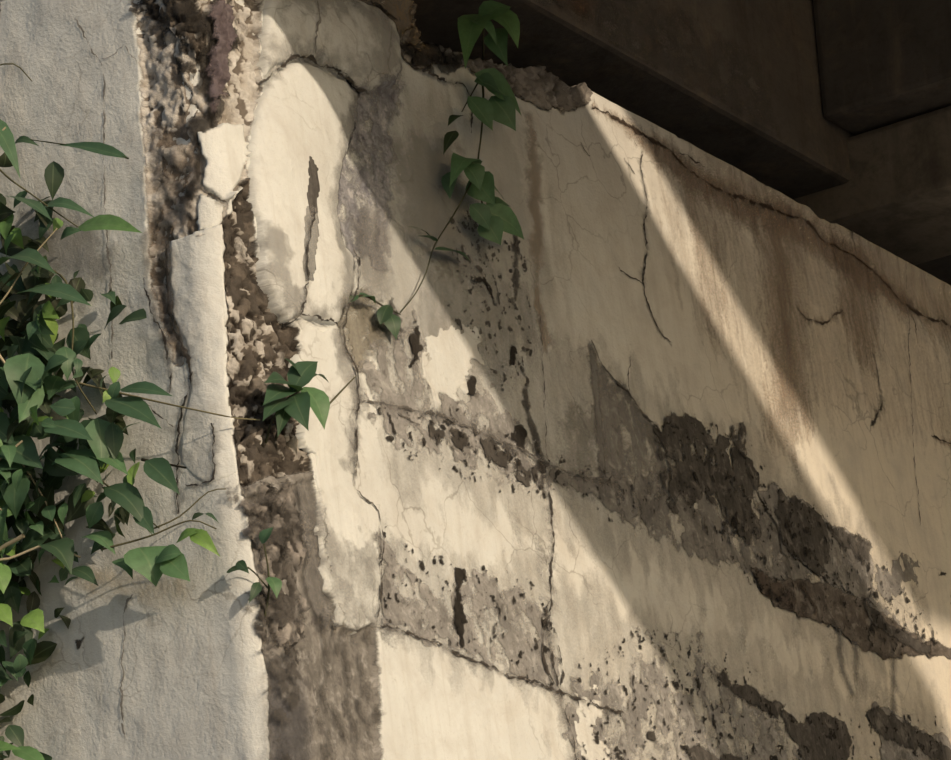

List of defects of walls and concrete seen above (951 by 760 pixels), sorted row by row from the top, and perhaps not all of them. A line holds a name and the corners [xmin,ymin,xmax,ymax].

crack [75,19,137,291]
crack [143,242,241,514]
leakage [384,545,452,623]
leakage [373,403,486,482]
crack [281,212,624,760]
spalling [129,0,852,760]
leakage [451,211,566,498]
leakage [501,579,556,683]
spalling [358,298,951,660]
leakage [578,345,942,760]
crack [591,107,951,524]
spalling [867,701,951,760]